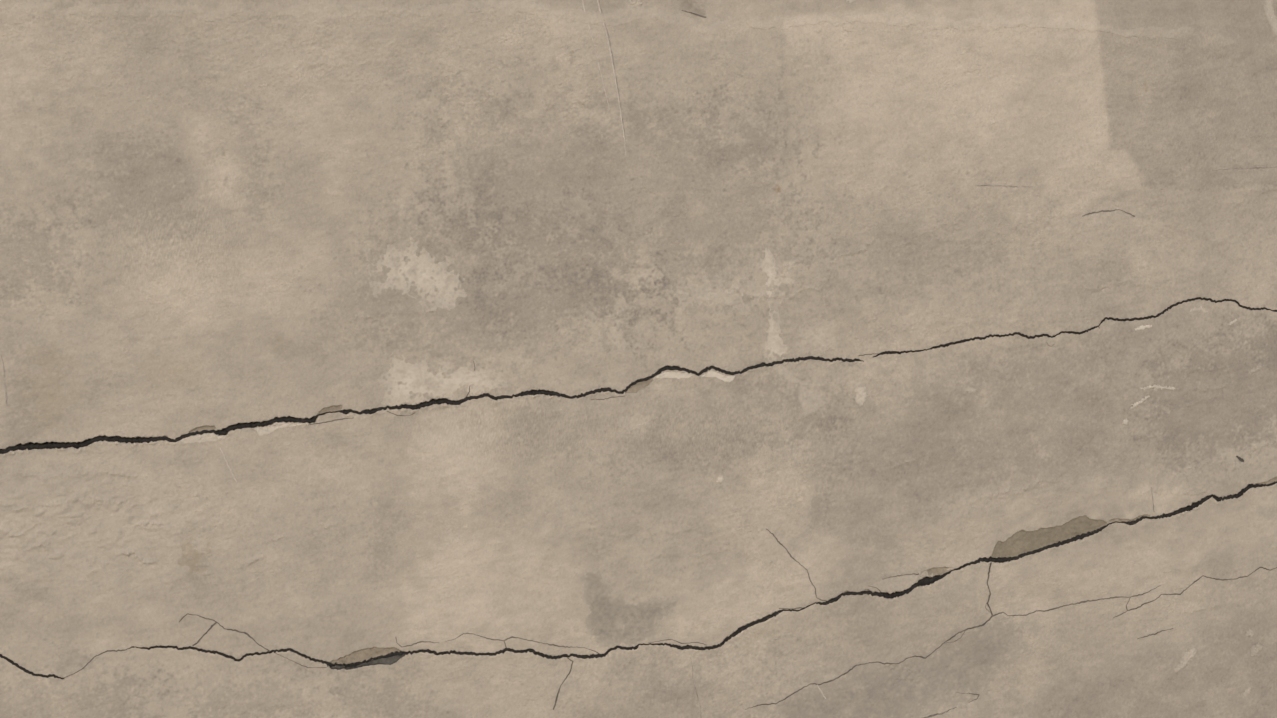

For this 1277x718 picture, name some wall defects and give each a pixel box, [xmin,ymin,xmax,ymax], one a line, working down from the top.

crack [0,297,1277,454]
crack [0,481,1277,712]
spalling [991,515,1150,558]
crack [924,692,979,718]